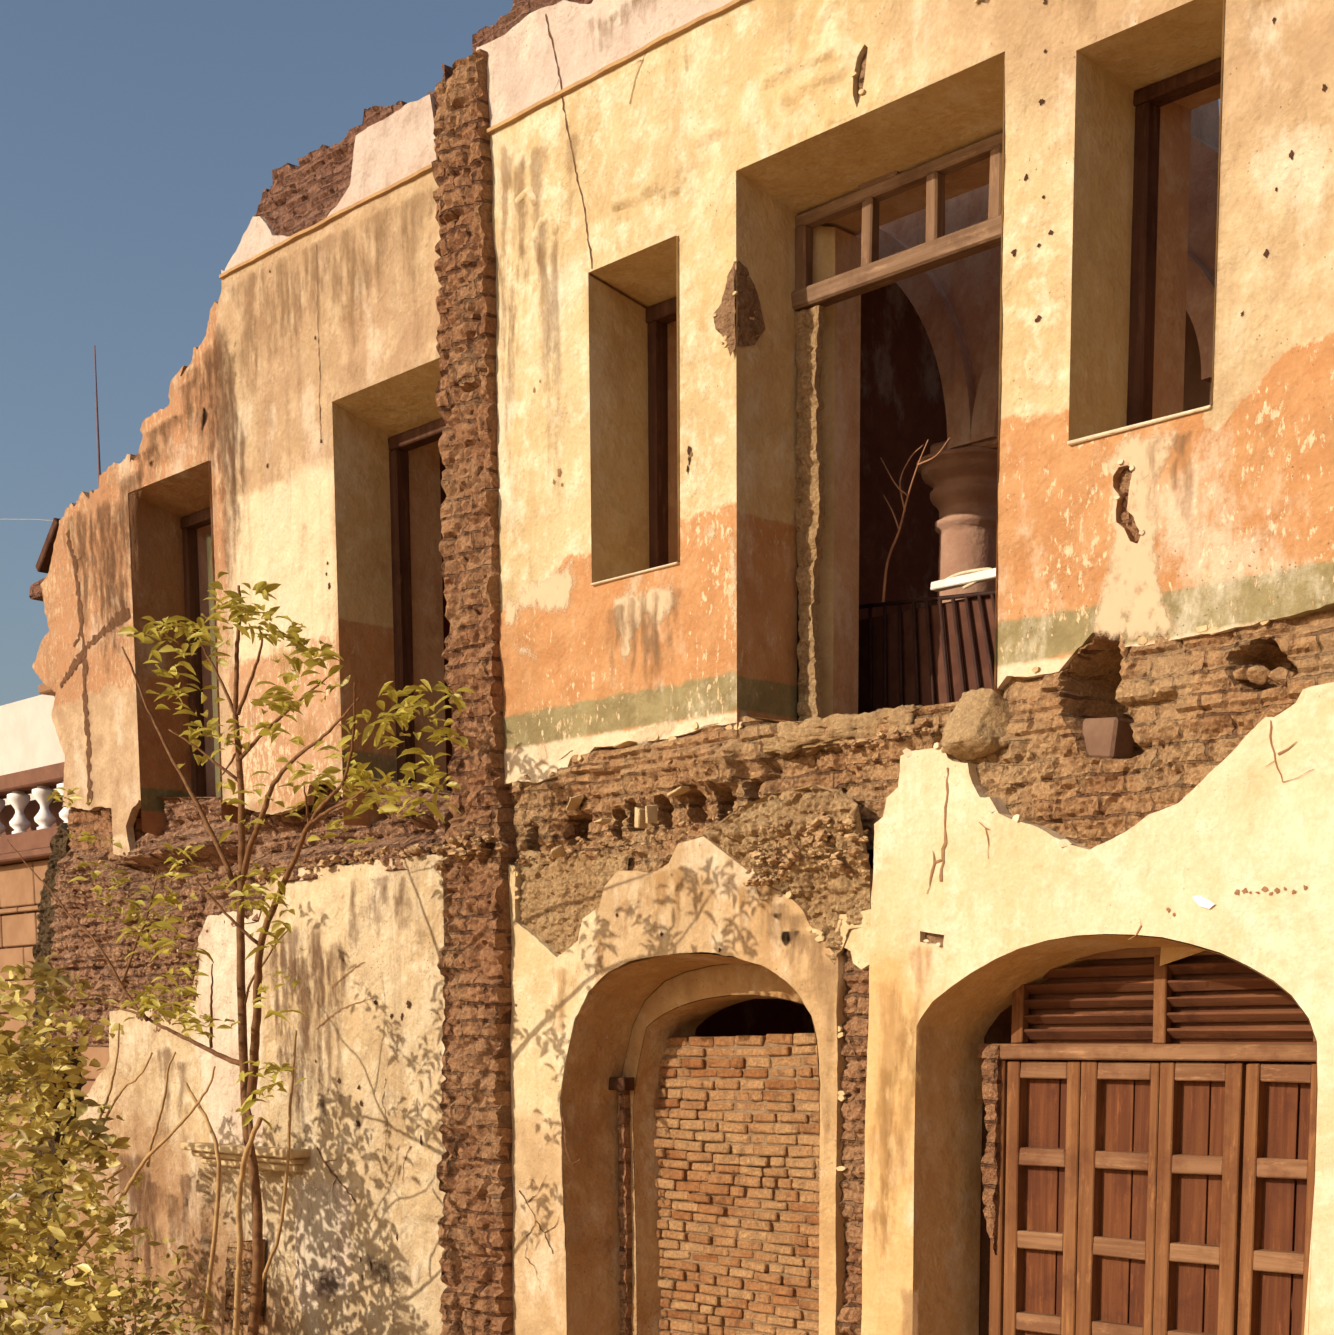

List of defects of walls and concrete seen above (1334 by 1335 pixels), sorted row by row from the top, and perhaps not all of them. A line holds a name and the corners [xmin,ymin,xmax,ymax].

flaking render [851,49,868,101]
crack [545,14,648,309]
flaking render [712,258,765,356]
peeling [503,560,572,625]
peeling [614,587,676,662]
flaking render [955,430,1334,849]
crack [926,767,948,894]
flaking render [47,778,454,1047]
flaking render [1234,885,1308,895]
leakage [299,1187,341,1300]
leakage [367,1258,419,1283]
crack [519,1116,580,1290]